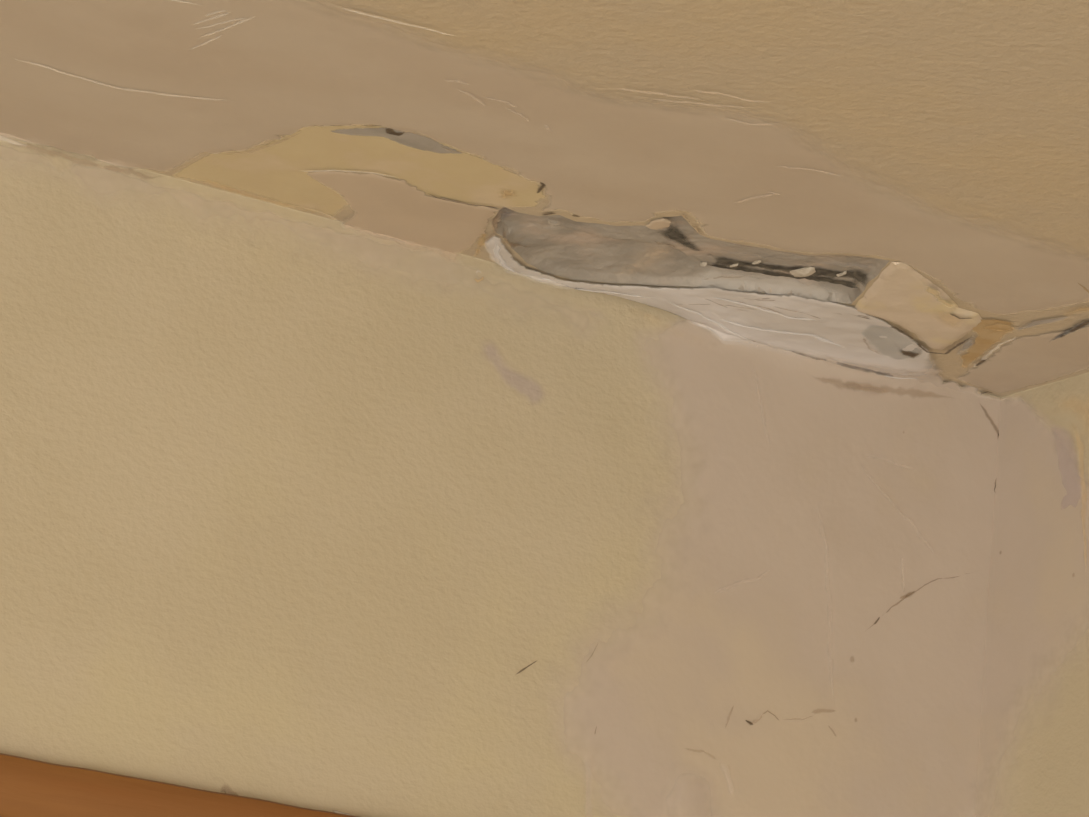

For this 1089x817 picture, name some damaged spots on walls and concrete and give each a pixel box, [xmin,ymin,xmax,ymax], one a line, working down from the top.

spalling [173,125,889,304]
spalling [863,326,920,359]
crack [872,573,969,626]